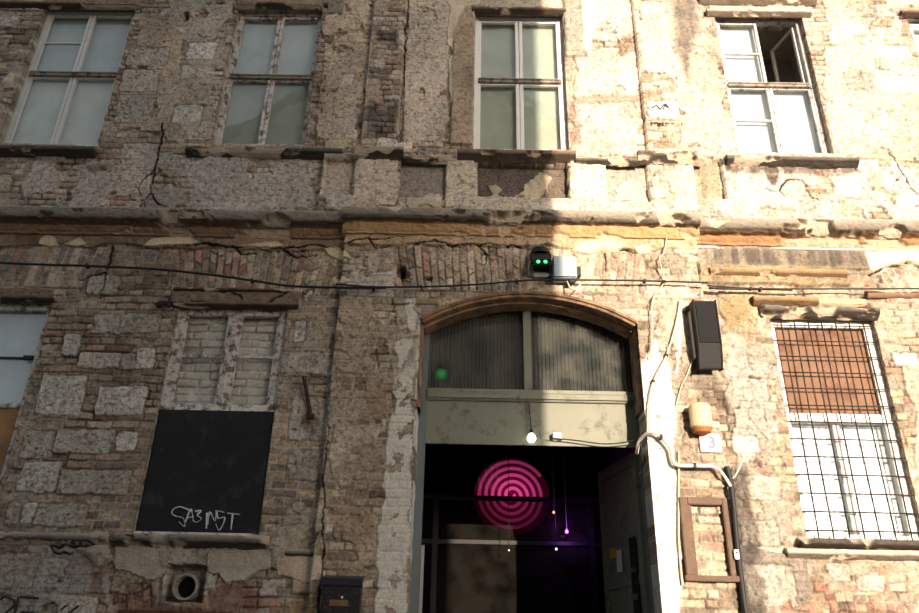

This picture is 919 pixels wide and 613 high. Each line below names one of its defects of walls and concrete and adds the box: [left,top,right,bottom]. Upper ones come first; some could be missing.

crack [138,123,168,207]
peeling [514,172,552,198]
crack [766,179,819,201]
crack [888,153,918,195]
crack [80,246,114,299]
crack [174,236,550,266]
peeling [571,239,654,255]
peeling [863,251,919,272]
peeling [114,544,168,582]
peeling [206,546,322,584]